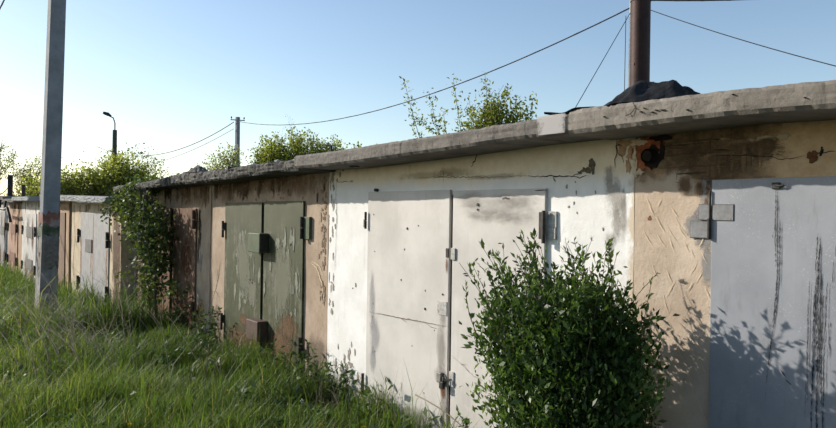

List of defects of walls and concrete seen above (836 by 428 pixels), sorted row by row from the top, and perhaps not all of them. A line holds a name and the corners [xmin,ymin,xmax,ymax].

crack [418,155,589,182]
flaking render [617,134,672,178]
crack [676,146,834,183]
flaking render [807,147,824,163]
water stain [606,171,625,248]
peeling [318,170,353,315]
peeling [234,226,300,320]